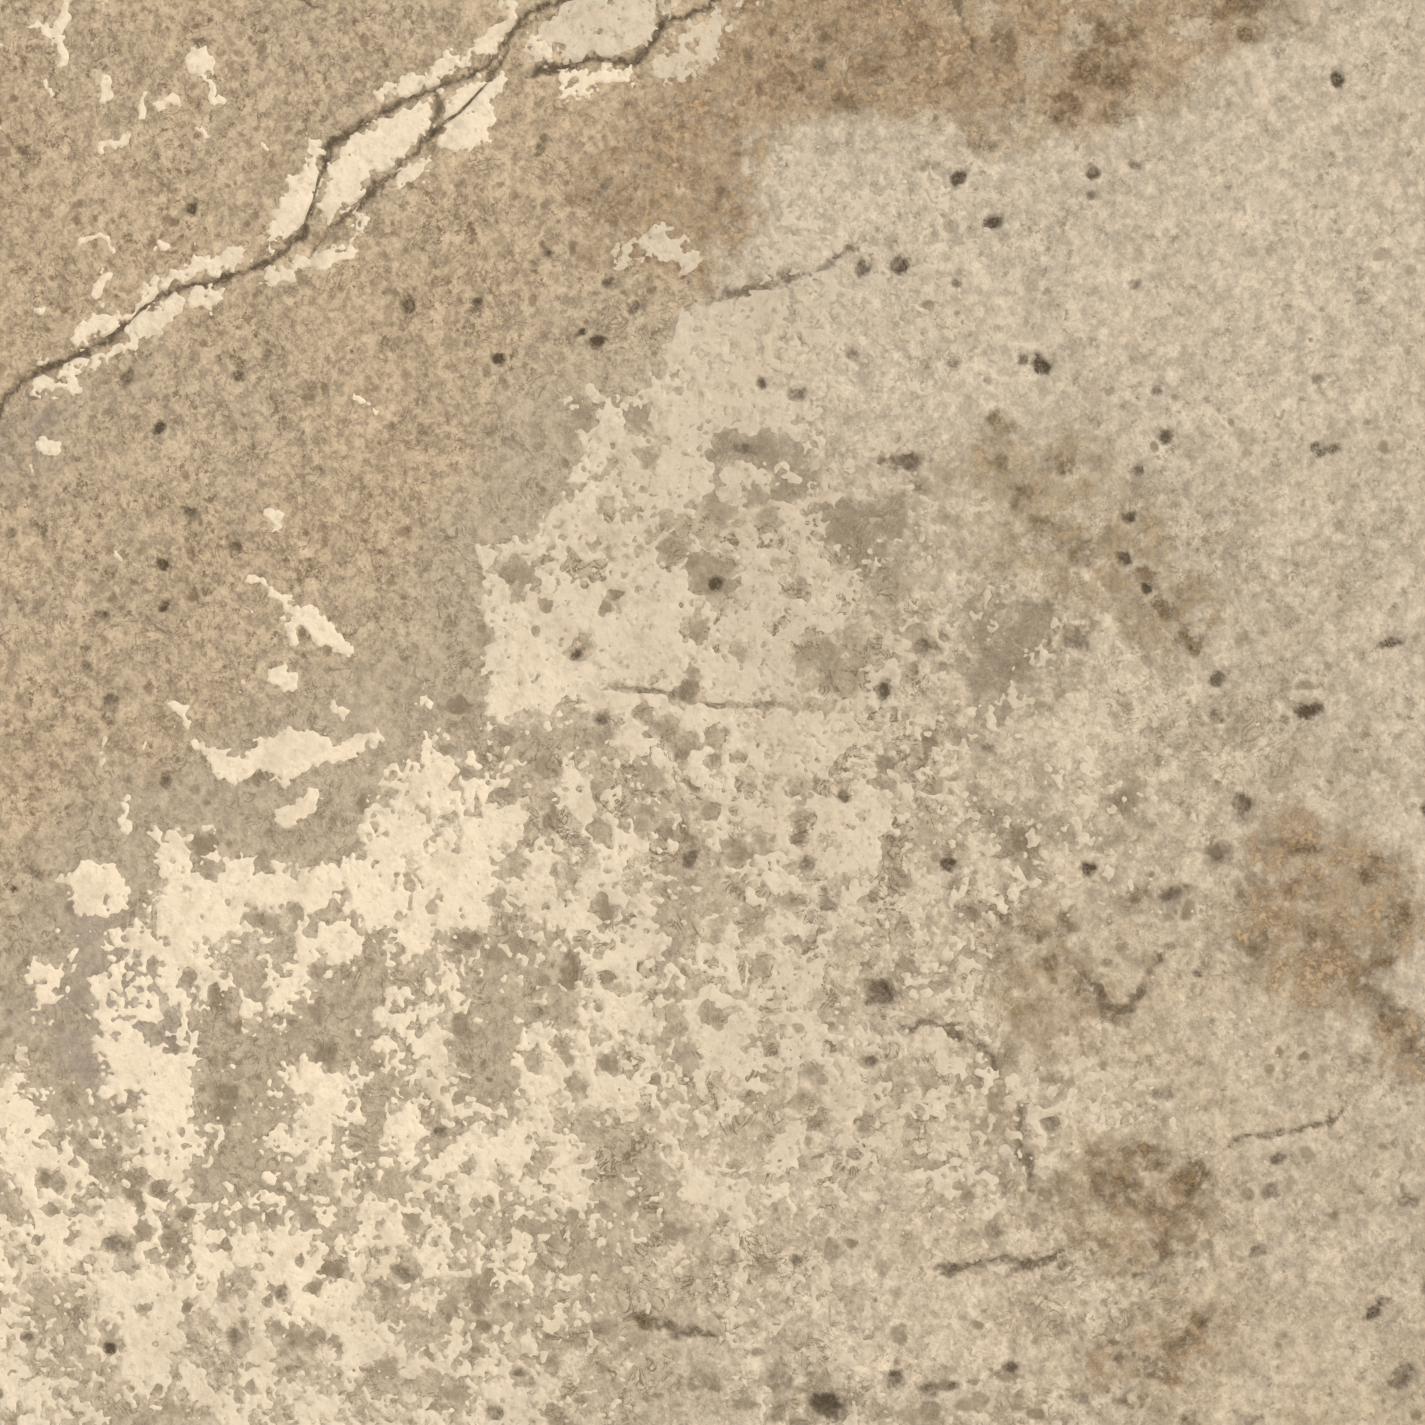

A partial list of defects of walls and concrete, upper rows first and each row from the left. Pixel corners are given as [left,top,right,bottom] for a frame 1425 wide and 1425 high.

crack [0,0,717,419]
water stain [963,614,1051,727]